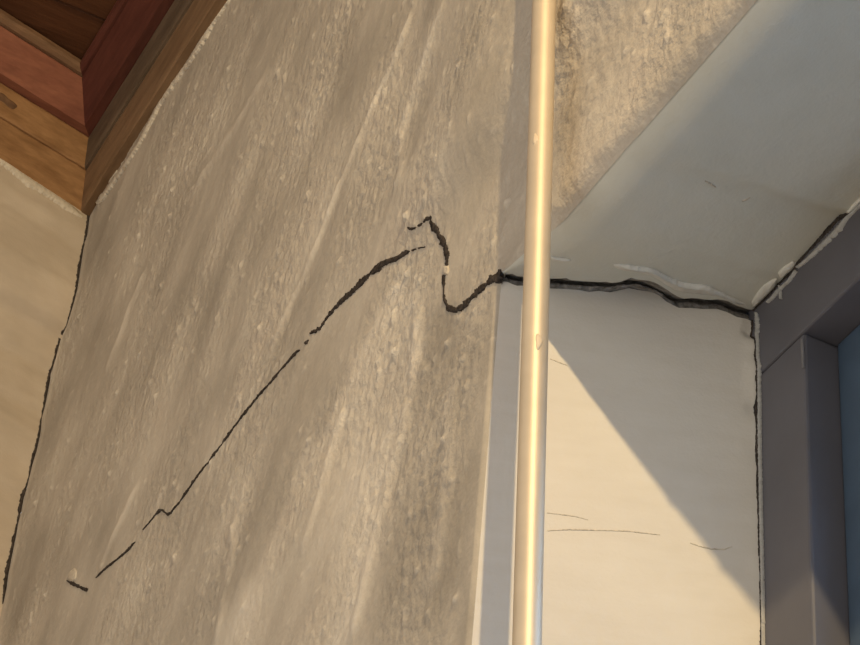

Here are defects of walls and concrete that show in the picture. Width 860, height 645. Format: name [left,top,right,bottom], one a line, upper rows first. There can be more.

crack [2,215,90,604]
crack [66,216,523,592]
crack [547,204,859,645]
peeling [614,261,796,307]